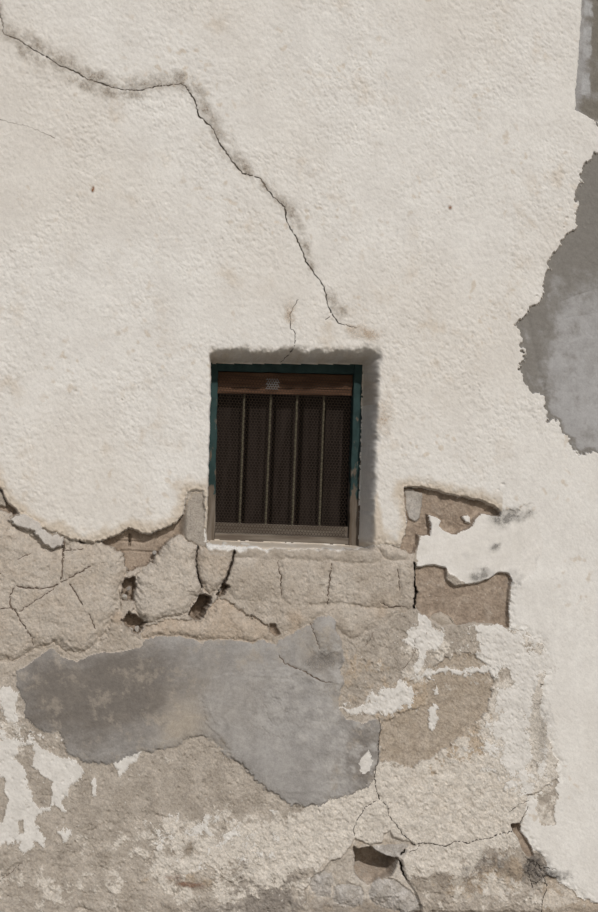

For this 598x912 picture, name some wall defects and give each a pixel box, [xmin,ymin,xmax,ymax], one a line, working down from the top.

crack [0,13,355,328]
crack [0,541,96,645]
crack [196,550,235,595]
crack [380,562,418,608]
spalling [0,487,559,857]
crack [279,656,331,683]
crack [353,717,529,878]
peeling [139,812,280,871]
spalling [306,831,422,912]
crack [525,857,555,912]